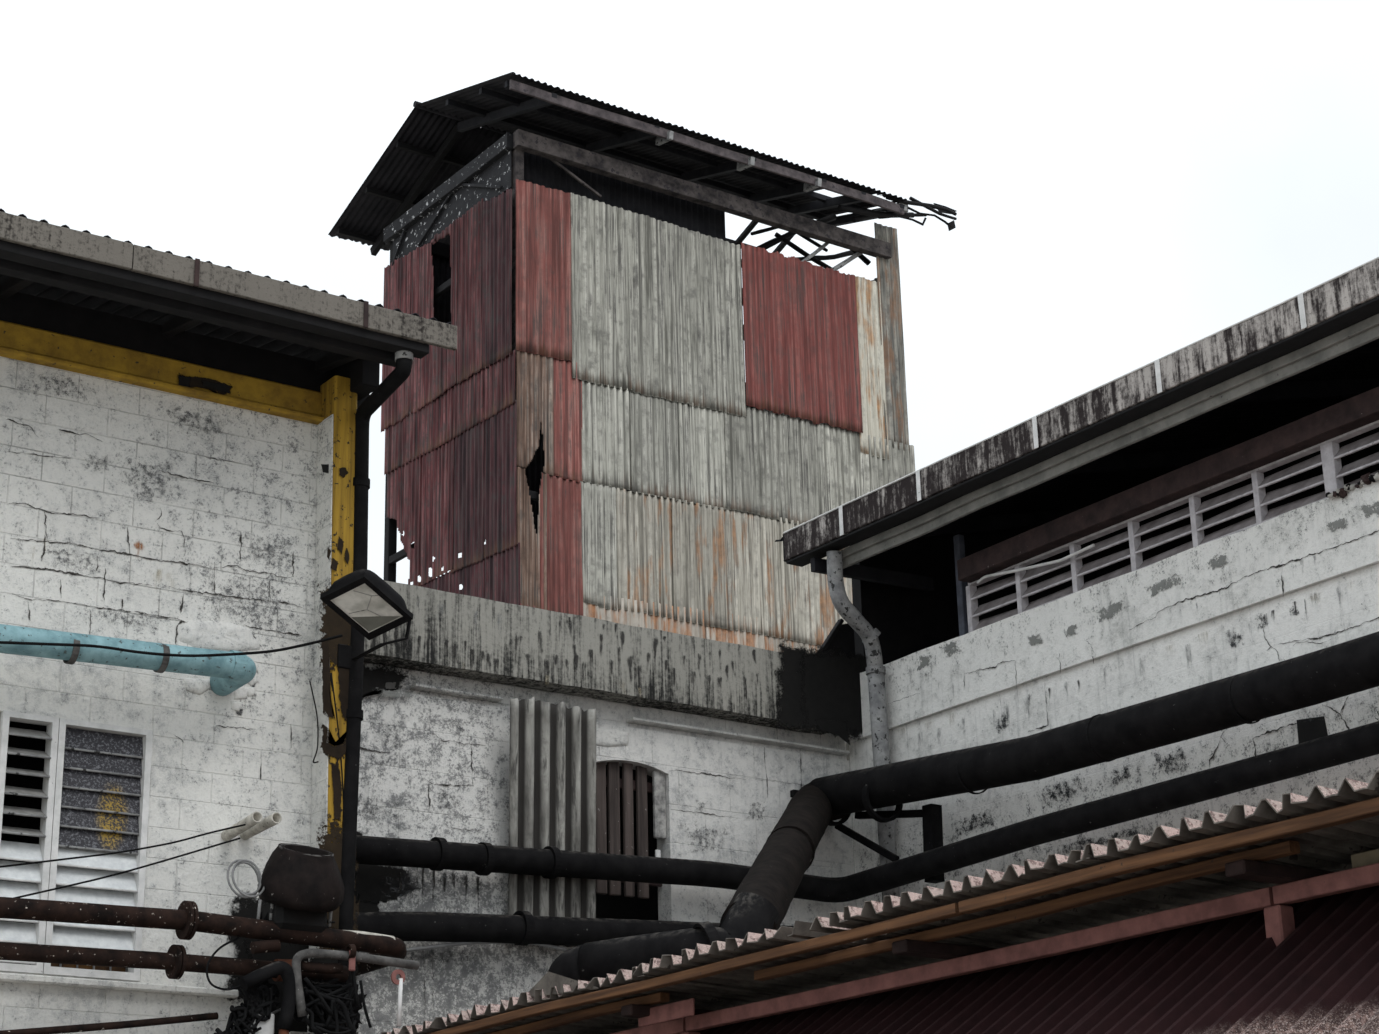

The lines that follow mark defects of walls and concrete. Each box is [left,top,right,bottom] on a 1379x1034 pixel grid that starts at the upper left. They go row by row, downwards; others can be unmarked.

damp [163,407,223,438]
damp [85,454,176,501]
damp [46,546,99,572]
damp [199,535,293,643]
crack [1130,530,1379,659]
damp [445,640,499,672]
damp [515,617,867,745]